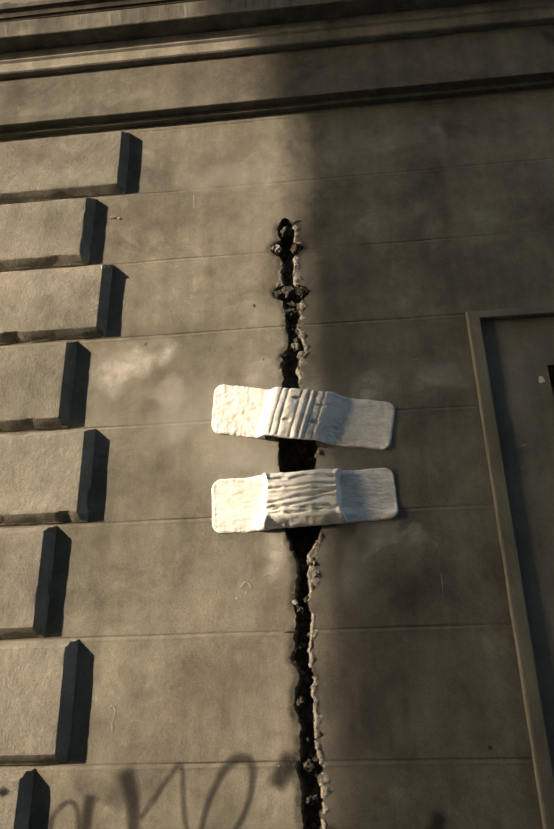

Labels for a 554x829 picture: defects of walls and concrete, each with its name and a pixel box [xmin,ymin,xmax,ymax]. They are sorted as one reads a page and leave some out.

crack [270,218,310,389]
crack [277,437,321,473]
crack [283,525,334,829]